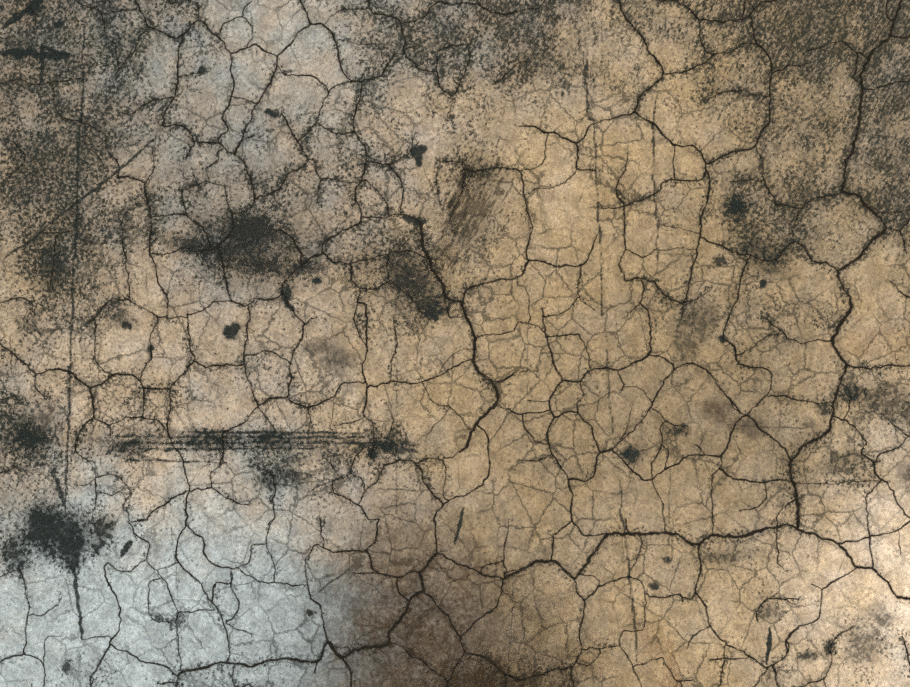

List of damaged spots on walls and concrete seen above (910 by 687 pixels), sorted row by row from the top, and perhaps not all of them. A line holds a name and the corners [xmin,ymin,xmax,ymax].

leakage [1,467,133,639]
leakage [153,205,324,312]
crack [0,0,606,687]
crack [481,0,910,687]